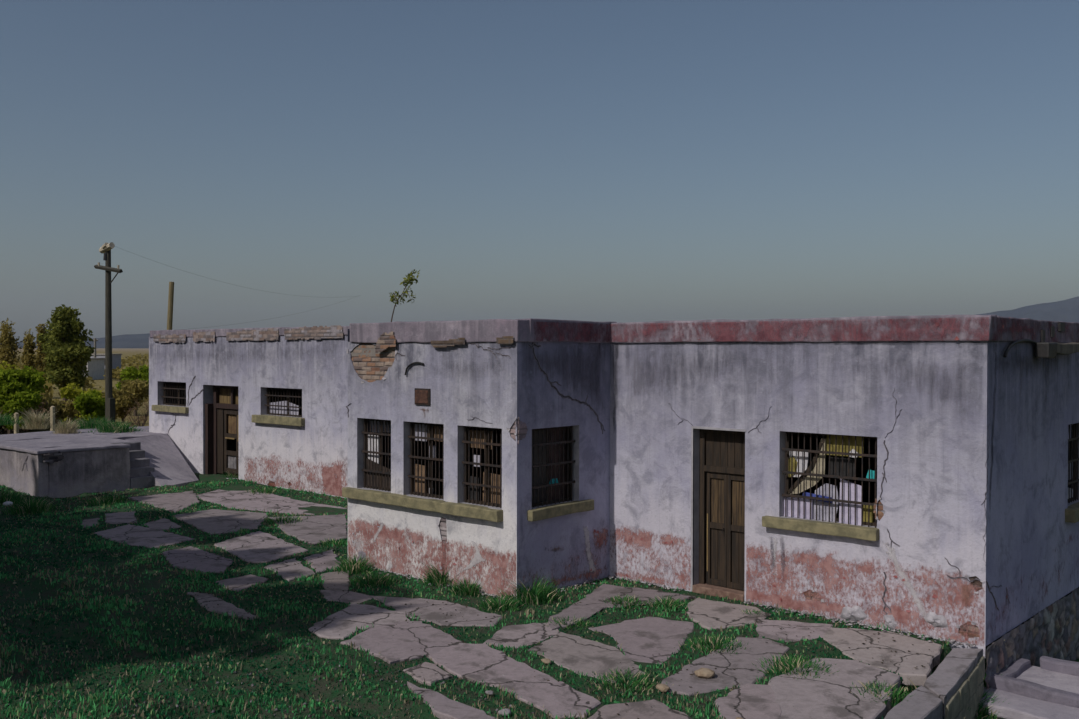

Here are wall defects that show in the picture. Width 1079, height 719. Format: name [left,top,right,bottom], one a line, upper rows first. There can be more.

crack [168,376,204,433]
flaking render [153,325,398,383]
peeling [244,458,348,497]
flaking render [507,417,528,444]
crack [471,342,605,434]
crack [880,388,901,499]
peeling [348,517,516,598]
peeling [529,526,691,590]
peeling [746,542,987,645]
crack [882,529,900,615]